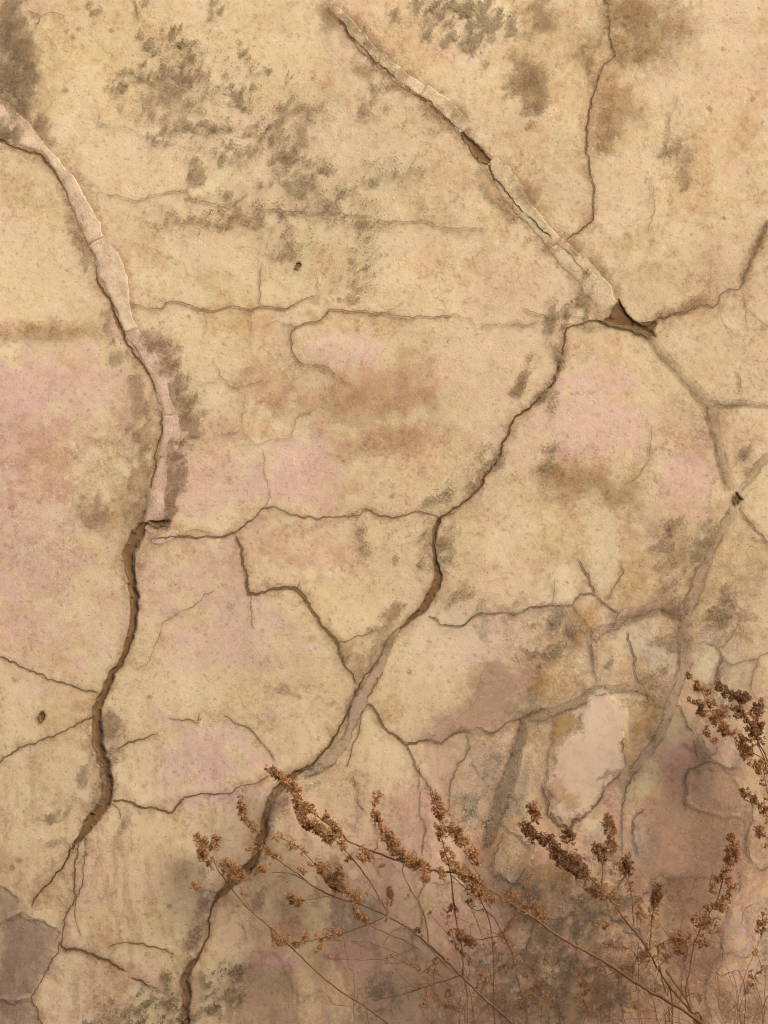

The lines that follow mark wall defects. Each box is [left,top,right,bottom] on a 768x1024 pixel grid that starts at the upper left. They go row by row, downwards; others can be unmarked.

crack [0,138,164,492]
water stain [104,0,430,304]
crack [96,190,483,229]
crack [129,267,547,389]
crack [327,0,616,272]
crack [547,315,605,389]
crack [653,220,768,326]
crack [0,397,768,1024]
peeling [547,690,627,819]